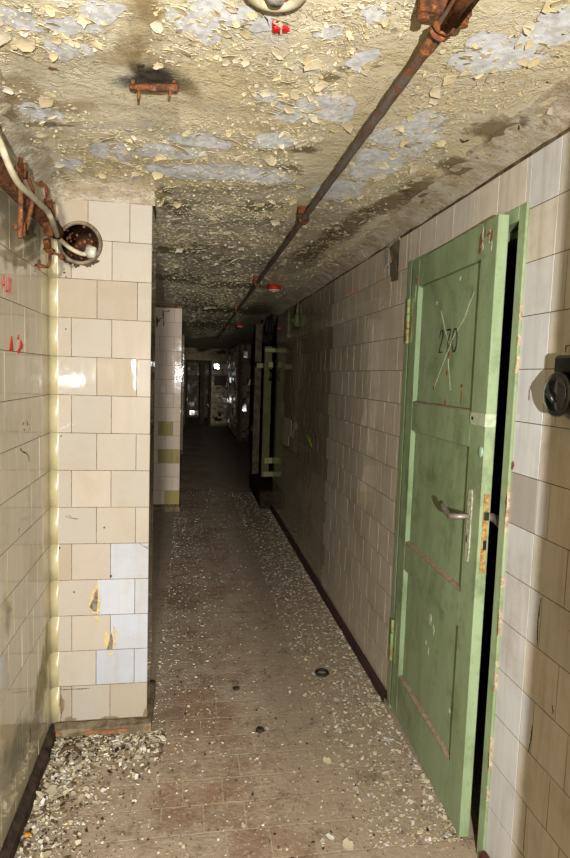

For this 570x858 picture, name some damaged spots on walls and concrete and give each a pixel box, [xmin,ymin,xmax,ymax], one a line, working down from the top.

peeling [0,0,570,338]
spalling [89,581,117,656]